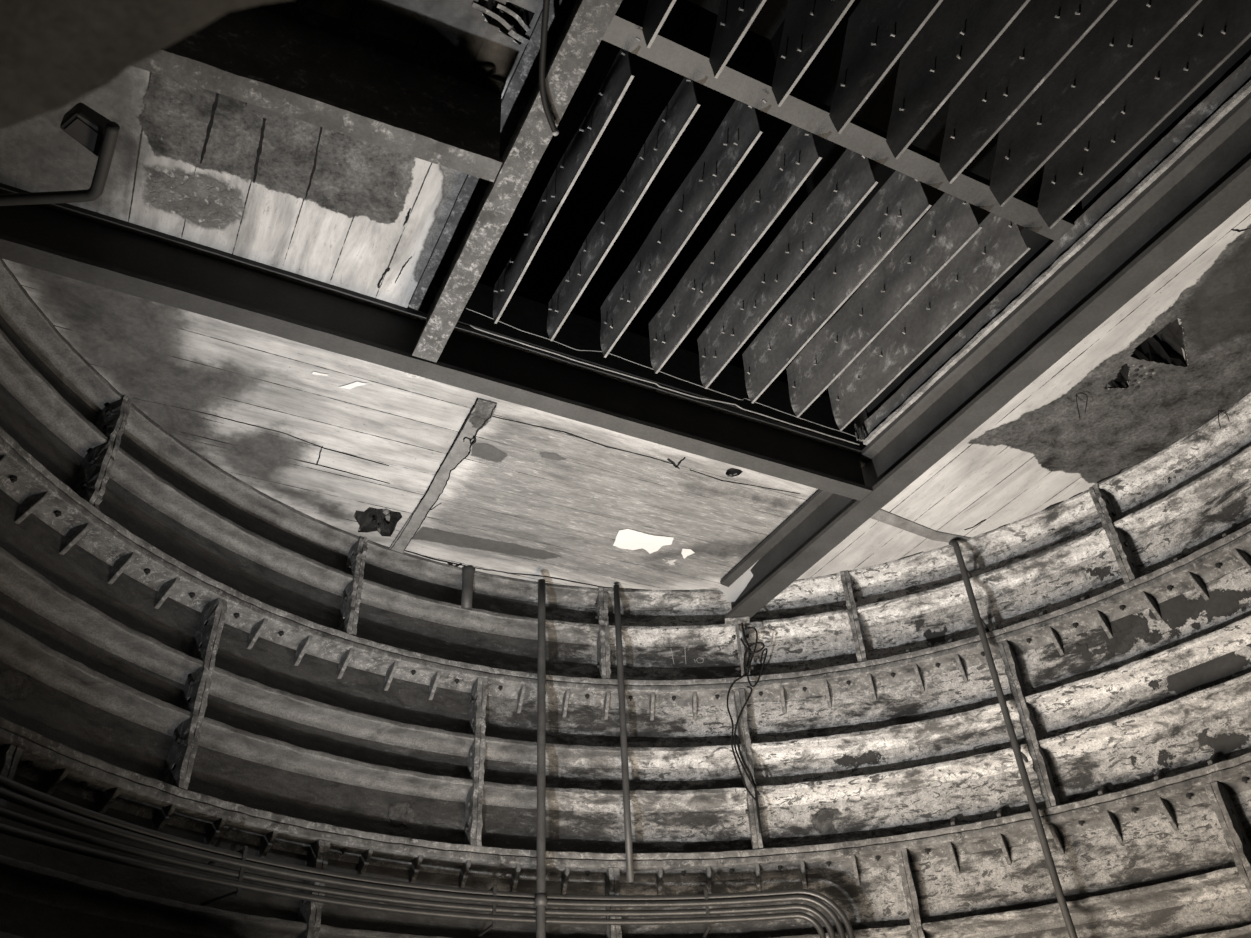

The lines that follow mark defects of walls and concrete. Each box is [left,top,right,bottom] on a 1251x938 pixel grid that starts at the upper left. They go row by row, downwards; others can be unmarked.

spalling [472,0,535,45]
crack [200,94,219,164]
crack [253,118,266,183]
crack [305,127,323,199]
crack [377,256,412,288]
spalling [1105,319,1188,389]
spalling [354,507,402,537]
peeling [613,529,695,565]